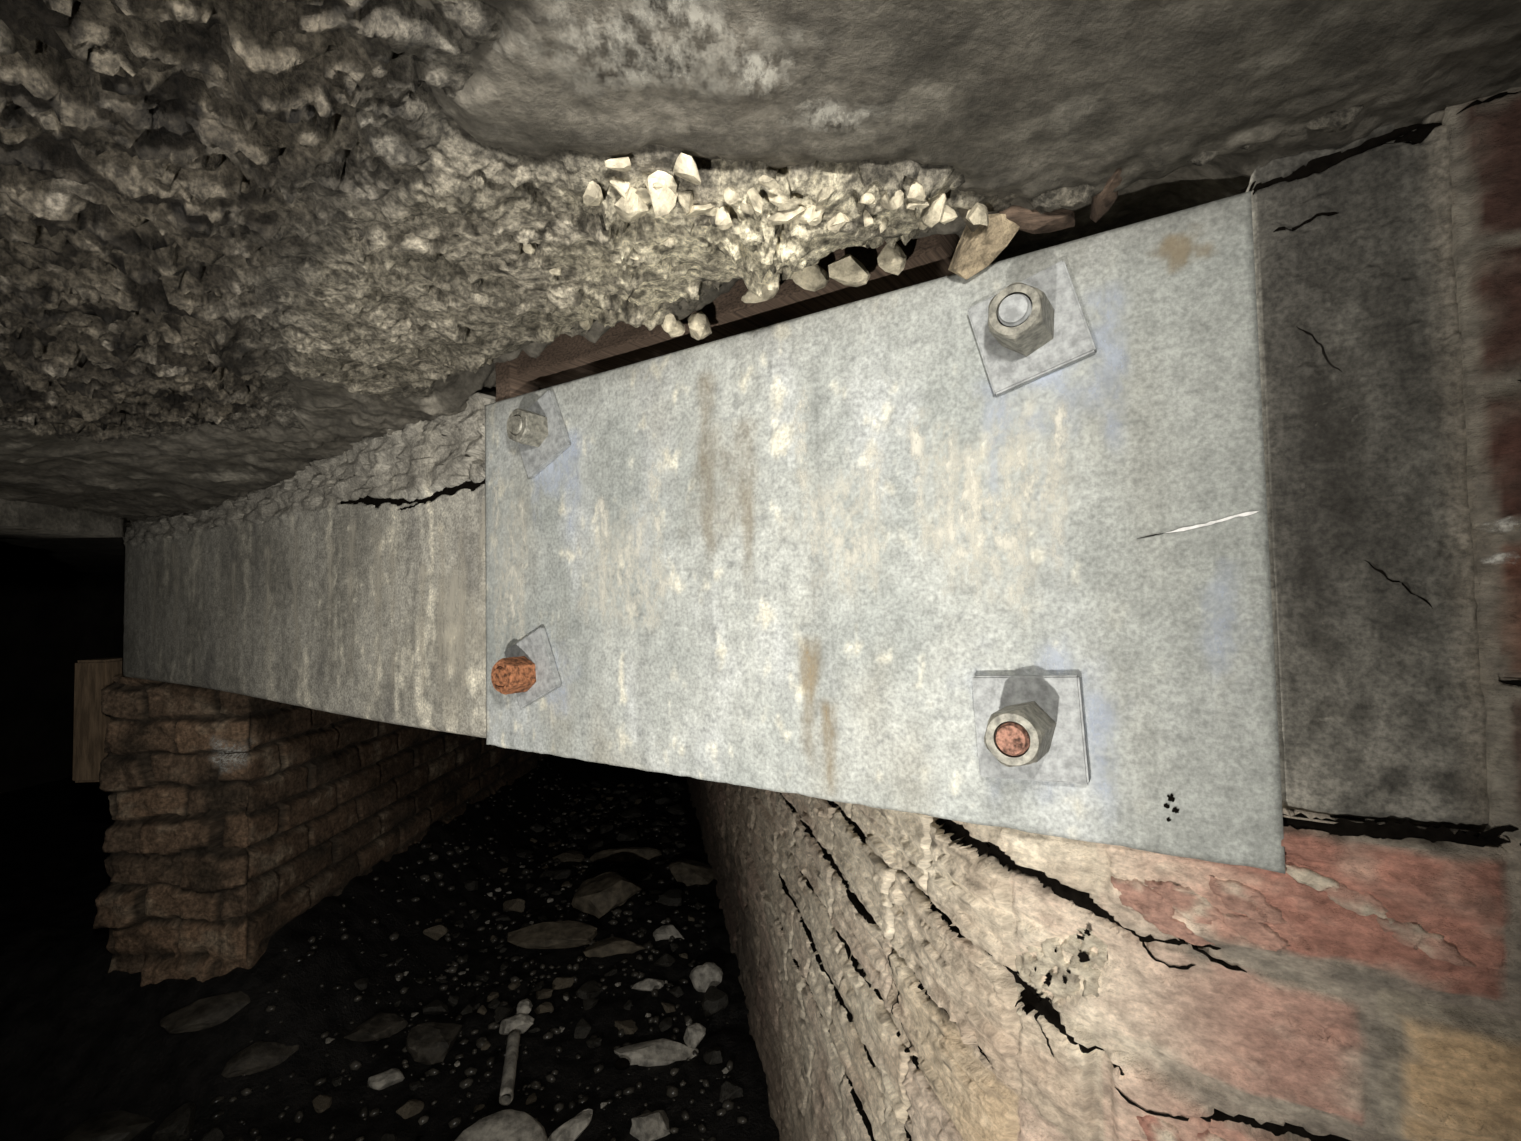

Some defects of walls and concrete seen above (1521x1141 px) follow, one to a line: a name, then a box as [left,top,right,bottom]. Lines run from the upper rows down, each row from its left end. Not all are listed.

spalling [1305,104,1365,133]
spalling [0,0,1096,444]
crack [341,479,485,511]
crack [774,793,948,1141]
crack [935,818,1247,973]
crack [901,870,1351,1141]
crack [1283,813,1521,847]